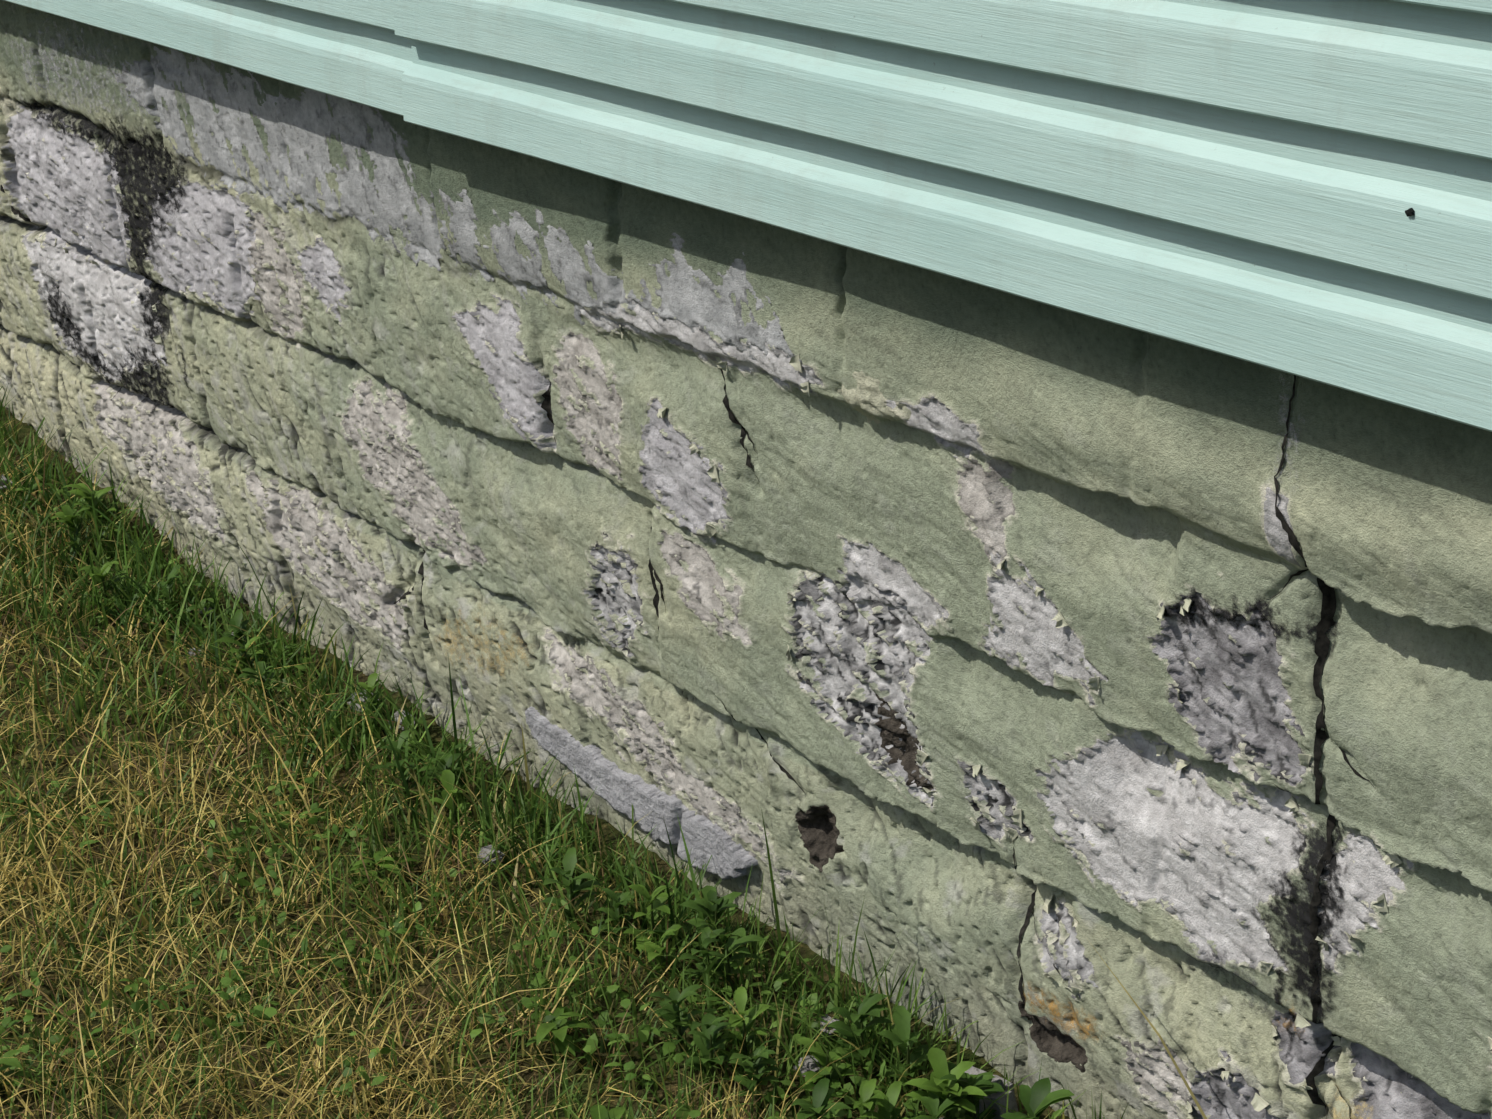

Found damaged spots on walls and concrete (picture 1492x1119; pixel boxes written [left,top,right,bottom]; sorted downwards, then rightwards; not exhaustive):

damp [13,30,191,423]
peeling [1,46,823,568]
spalling [584,532,648,657]
peeling [639,398,752,645]
crack [720,369,759,481]
spalling [786,537,949,809]
spalling [957,760,1034,844]
peeling [885,396,1108,705]
peeling [1035,590,1413,975]
crack [1268,375,1374,1119]
spalling [1271,1010,1491,1119]